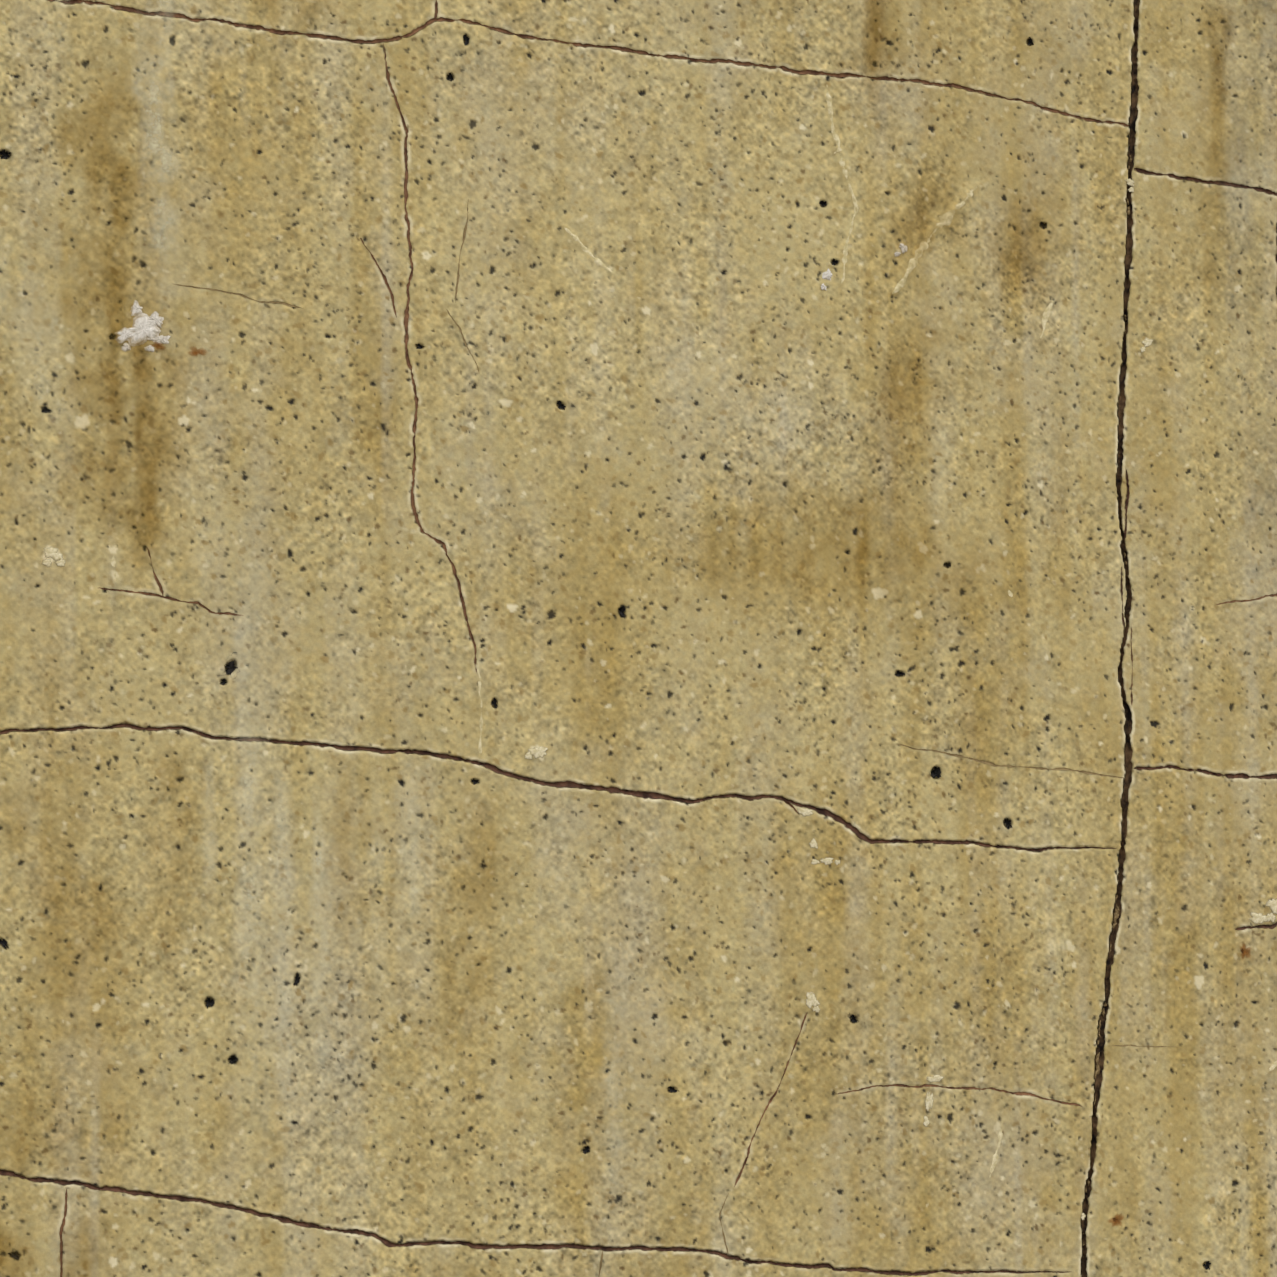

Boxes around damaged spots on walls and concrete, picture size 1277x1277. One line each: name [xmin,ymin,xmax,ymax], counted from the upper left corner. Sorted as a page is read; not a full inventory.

crack [49,0,1277,672]
crack [0,723,1116,852]
crack [1028,185,1277,1277]
crack [0,1013,1083,1277]